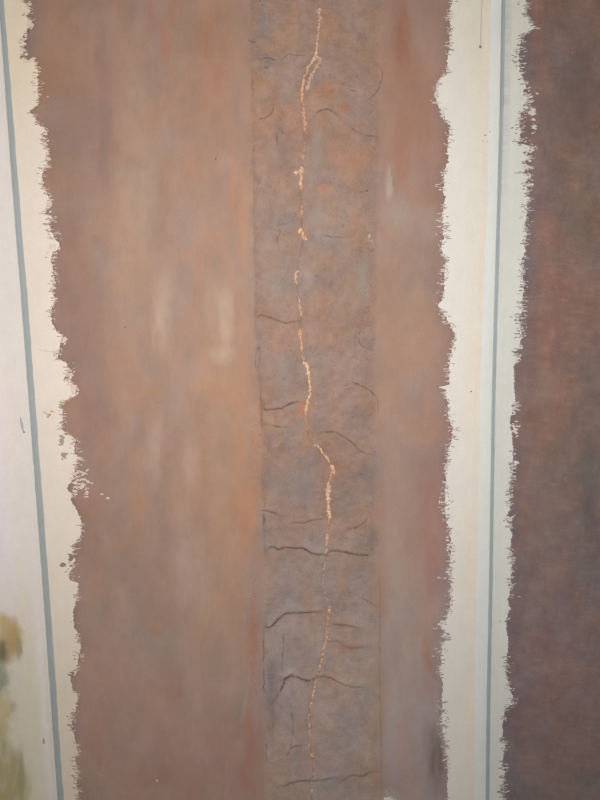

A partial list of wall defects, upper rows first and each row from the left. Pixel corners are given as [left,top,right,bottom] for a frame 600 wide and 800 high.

rust [387,0,440,209]
crack [248,0,383,800]
rust [416,463,441,712]
rust [113,753,186,795]